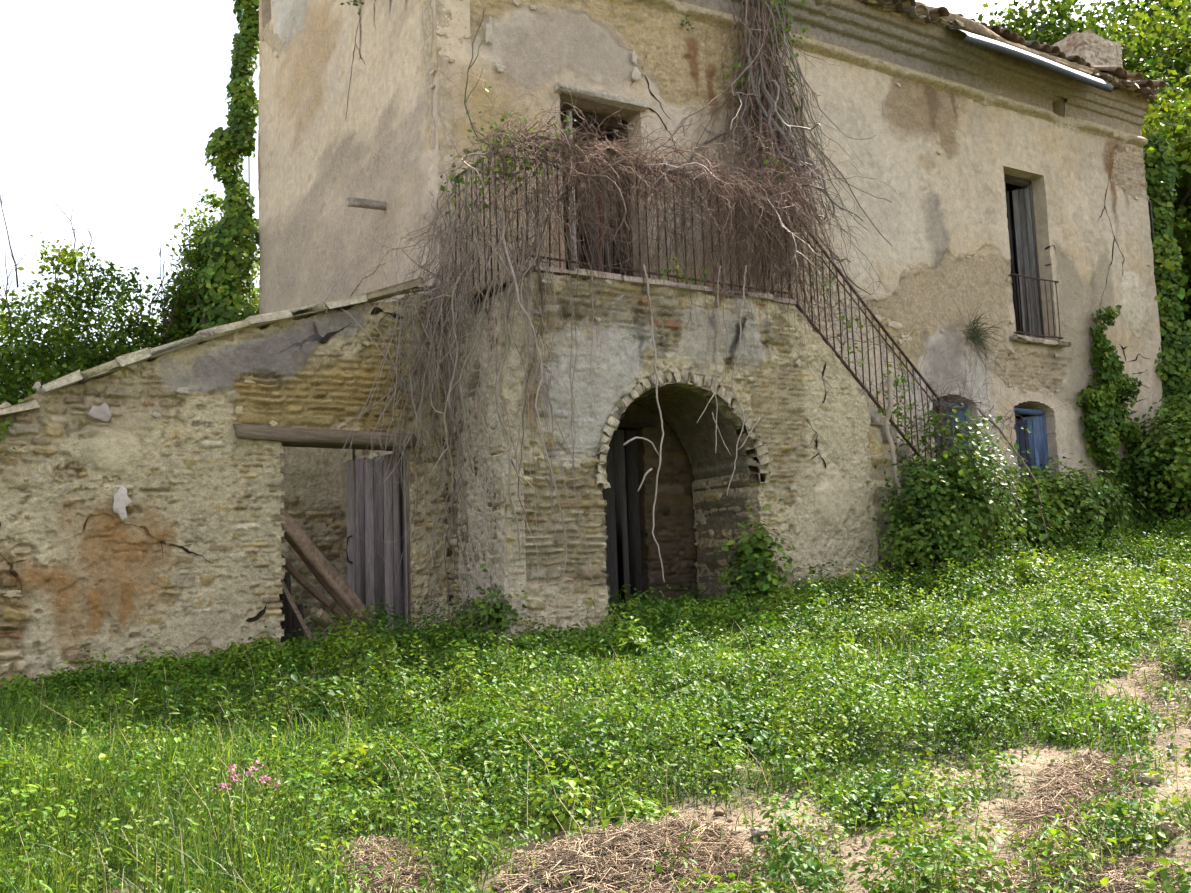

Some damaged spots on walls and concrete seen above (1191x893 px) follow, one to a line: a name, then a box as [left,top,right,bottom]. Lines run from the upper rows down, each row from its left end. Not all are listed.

spalling [422,0,756,149]
spalling [234,333,412,432]
flaking render [863,252,1068,392]
spalling [0,590,26,693]